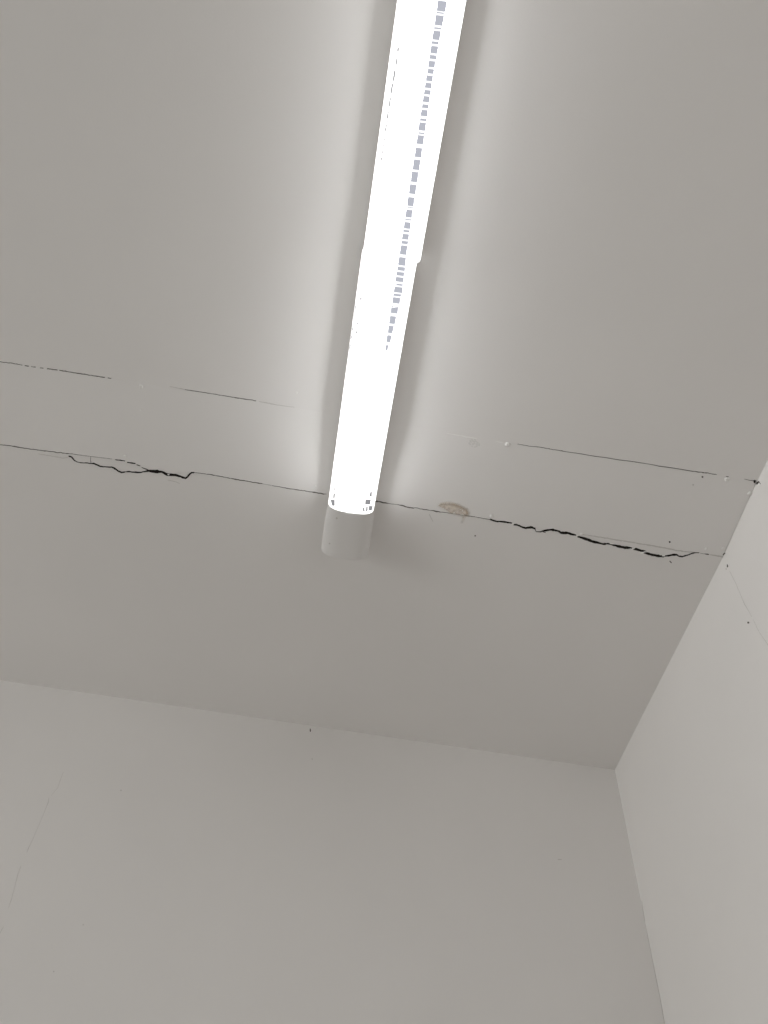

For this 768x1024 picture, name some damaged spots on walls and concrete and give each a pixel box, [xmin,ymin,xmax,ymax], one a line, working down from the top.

crack [5,445,324,495]
crack [376,501,768,645]